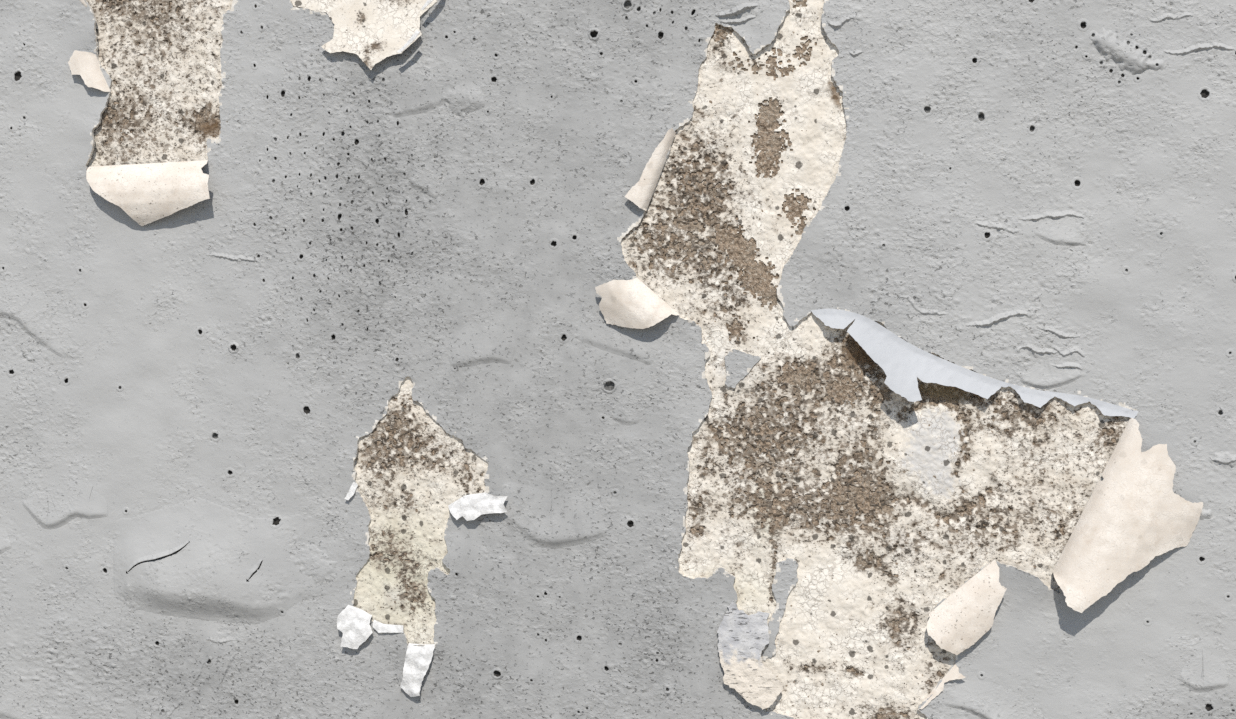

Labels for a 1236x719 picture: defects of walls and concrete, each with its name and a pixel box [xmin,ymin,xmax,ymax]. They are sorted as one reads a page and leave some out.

peeling [68,0,233,226]
peeling [290,0,437,70]
peeling [595,0,1203,719]
peeling [337,377,508,697]